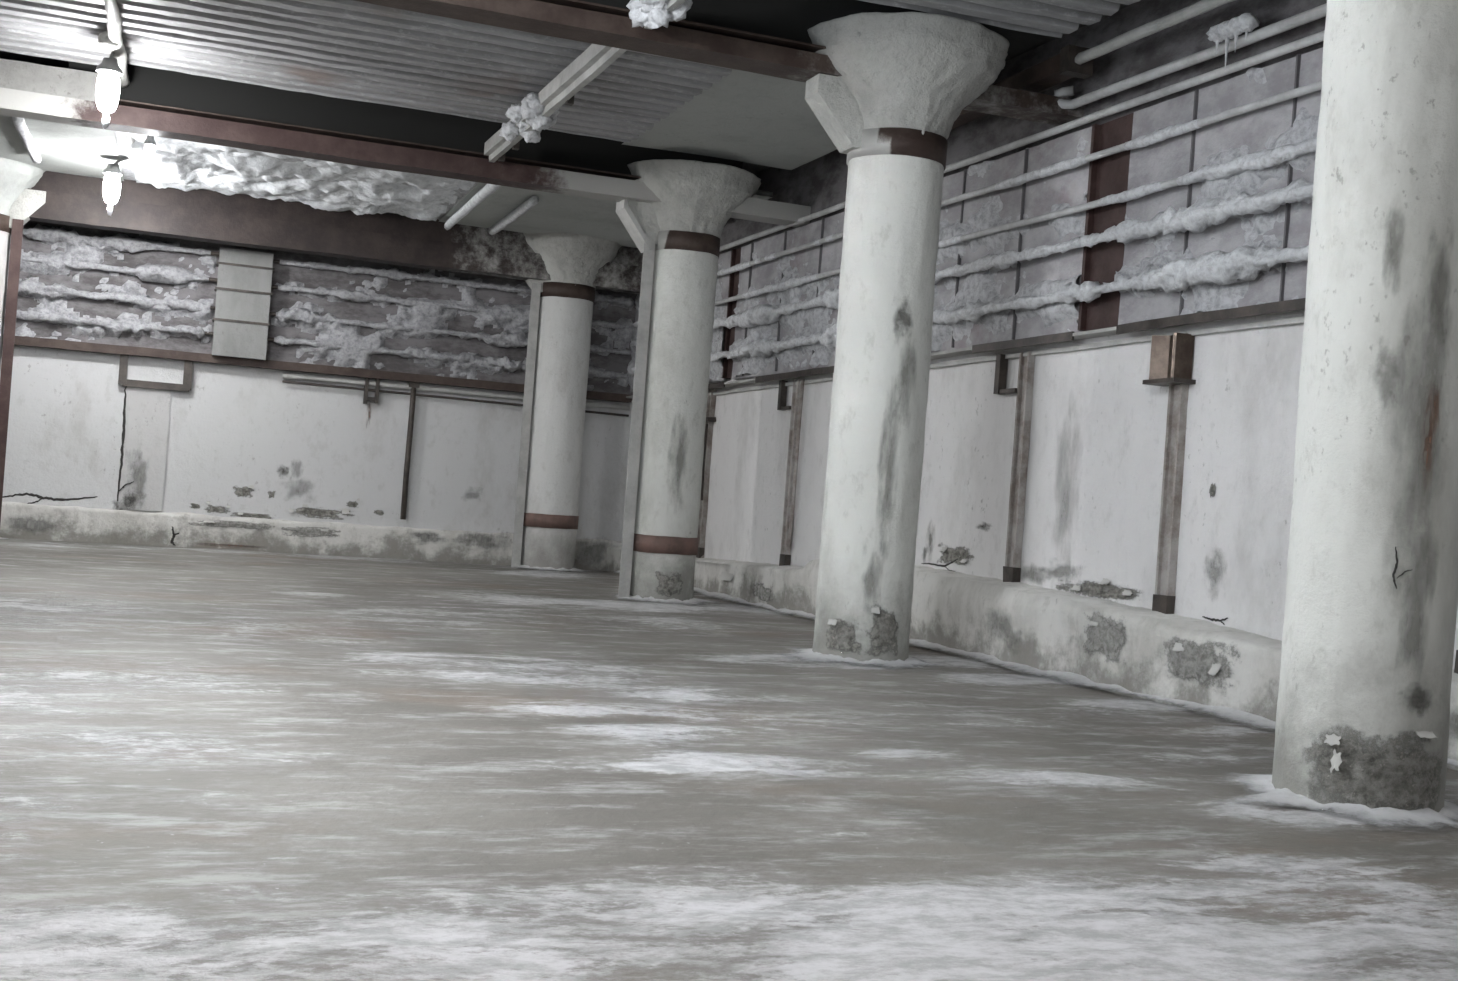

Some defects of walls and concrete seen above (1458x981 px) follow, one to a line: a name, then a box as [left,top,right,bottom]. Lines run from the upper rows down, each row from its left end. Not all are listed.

water stain [1387,225,1398,269]
water stain [895,302,911,328]
water stain [1409,258,1447,508]
crack [3,386,134,504]
water stain [880,434,894,511]
spalling [826,607,898,656]
water stain [865,568,875,595]
spalling [1056,578,1139,661]
spalling [1165,637,1239,688]
water stain [1404,571,1421,656]
water stain [1410,691,1429,710]
spalling [1305,726,1440,814]